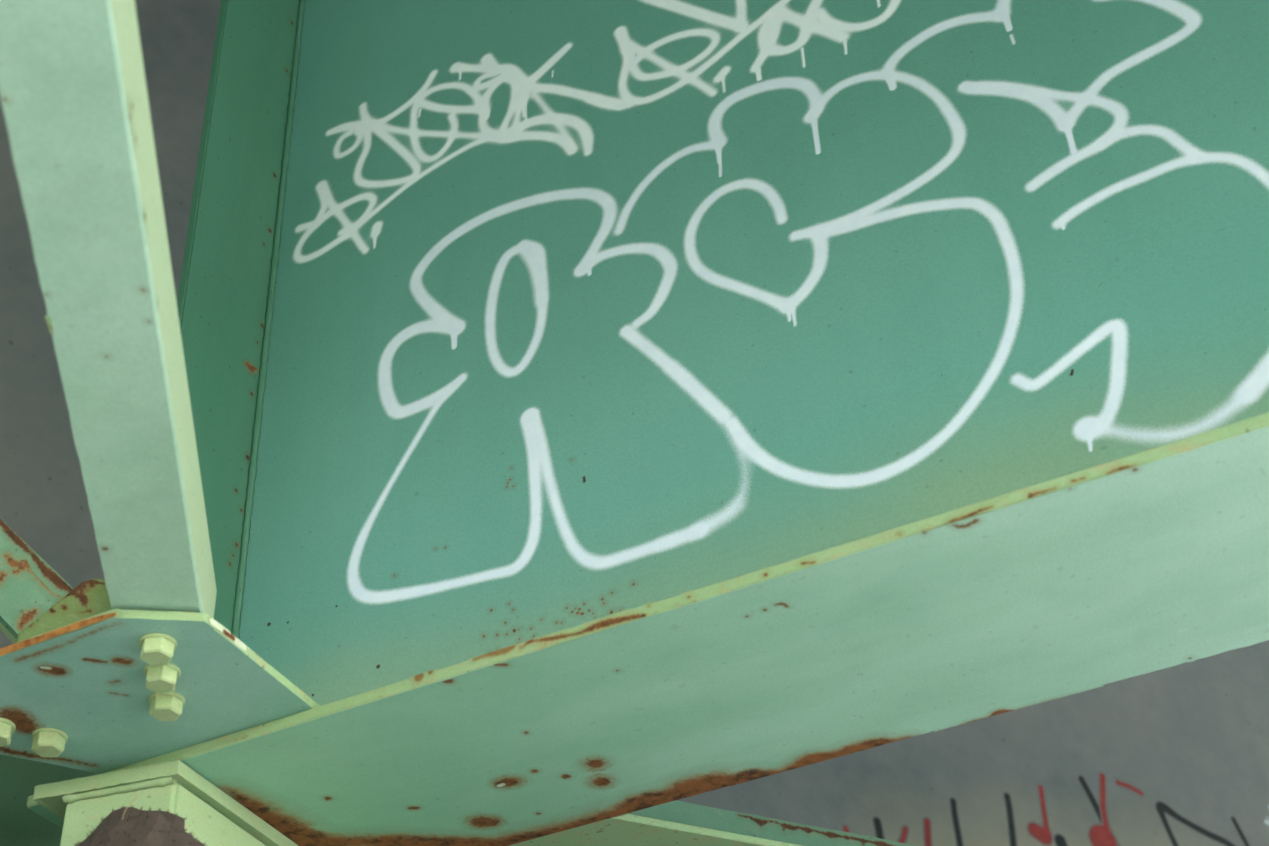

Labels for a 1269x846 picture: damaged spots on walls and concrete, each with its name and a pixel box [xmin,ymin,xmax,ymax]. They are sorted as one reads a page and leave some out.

rust [0,519,142,699]
rust [468,578,656,670]
rust [409,669,461,687]
rust [0,703,105,771]
rust [206,685,1103,846]